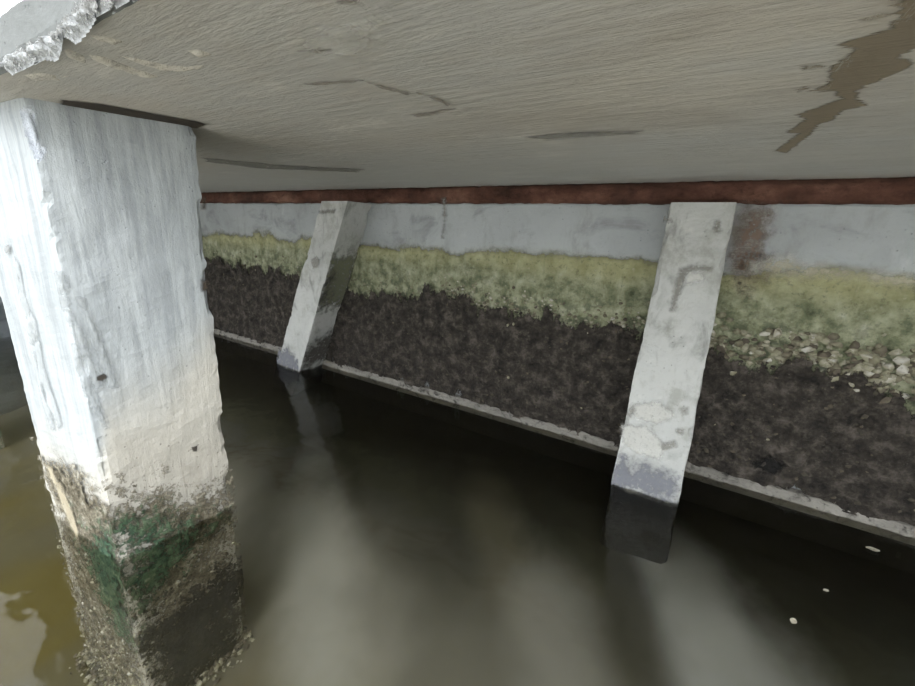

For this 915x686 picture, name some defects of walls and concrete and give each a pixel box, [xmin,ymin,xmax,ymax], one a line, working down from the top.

spalling [0,0,212,81]
damp [777,0,915,152]
rust [729,210,773,292]
damp [276,348,298,370]
damp [611,455,680,501]